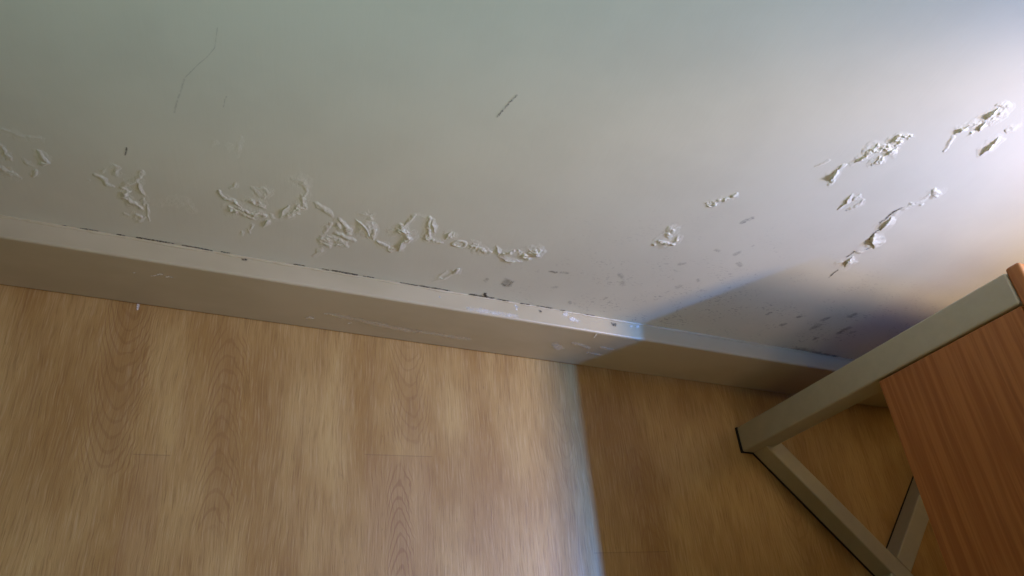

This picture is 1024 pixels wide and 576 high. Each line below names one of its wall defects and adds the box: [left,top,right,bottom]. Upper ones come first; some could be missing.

peeling [942,100,1023,158]
peeling [825,131,916,187]
peeling [216,181,282,236]
peeling [309,217,358,258]
peeling [384,212,547,266]
peeling [650,224,684,250]